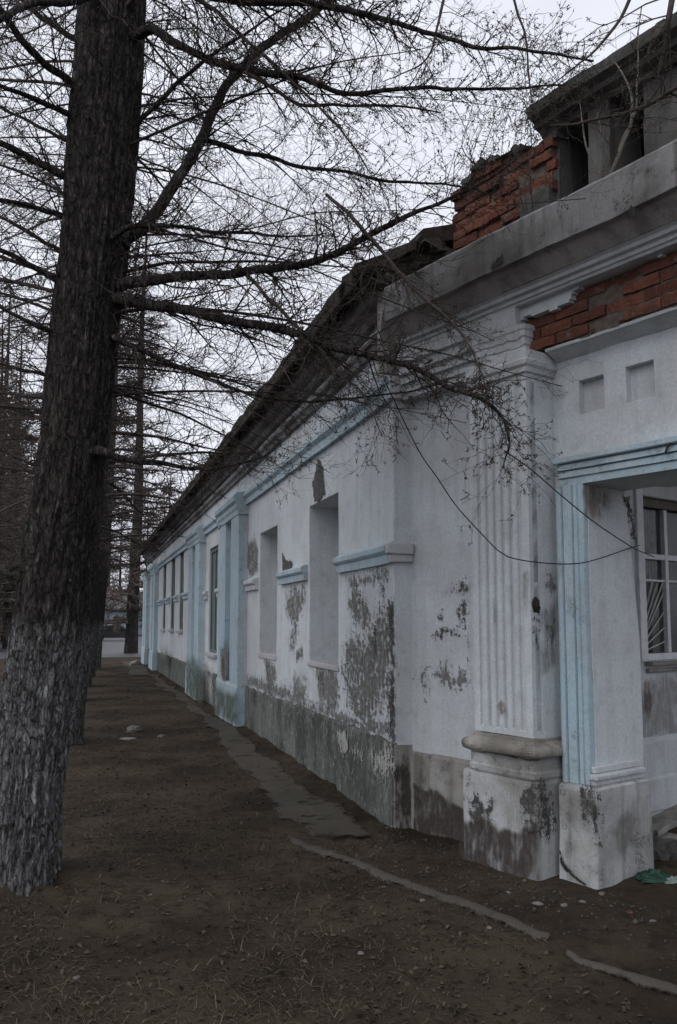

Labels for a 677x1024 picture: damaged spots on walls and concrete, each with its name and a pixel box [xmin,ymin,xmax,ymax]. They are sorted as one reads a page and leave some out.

spalling [450,128,572,251]
spalling [526,252,677,354]
spalling [312,456,325,503]
peeling [246,566,400,786]
peeling [414,577,473,703]
water stain [393,759,557,882]